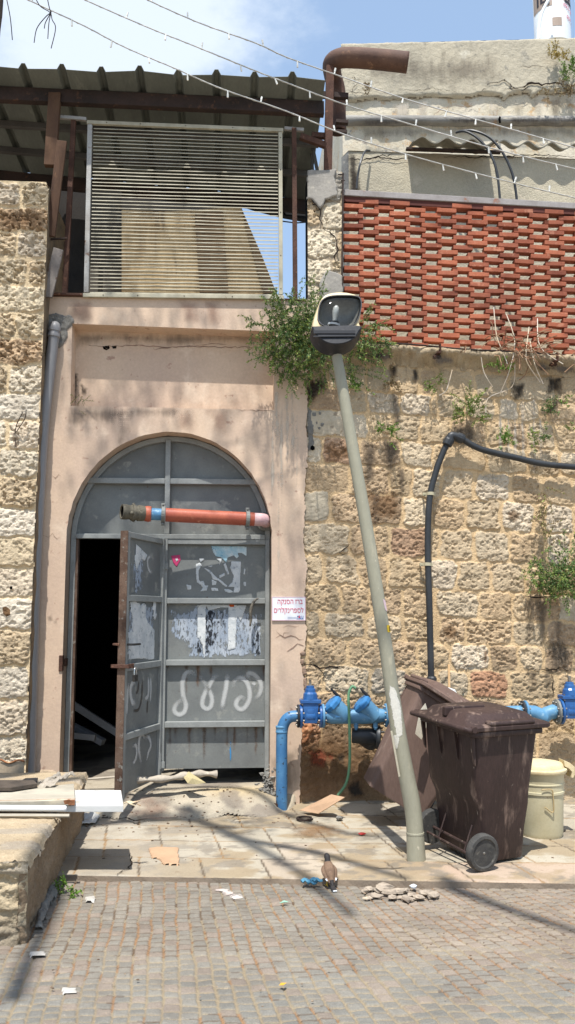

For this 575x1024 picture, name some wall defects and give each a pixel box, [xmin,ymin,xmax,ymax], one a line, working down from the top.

crack [405,65,566,123]
peeling [307,169,337,209]
peeling [319,270,343,298]
crack [89,342,253,350]
crack [276,625,343,680]
spalling [301,722,314,744]